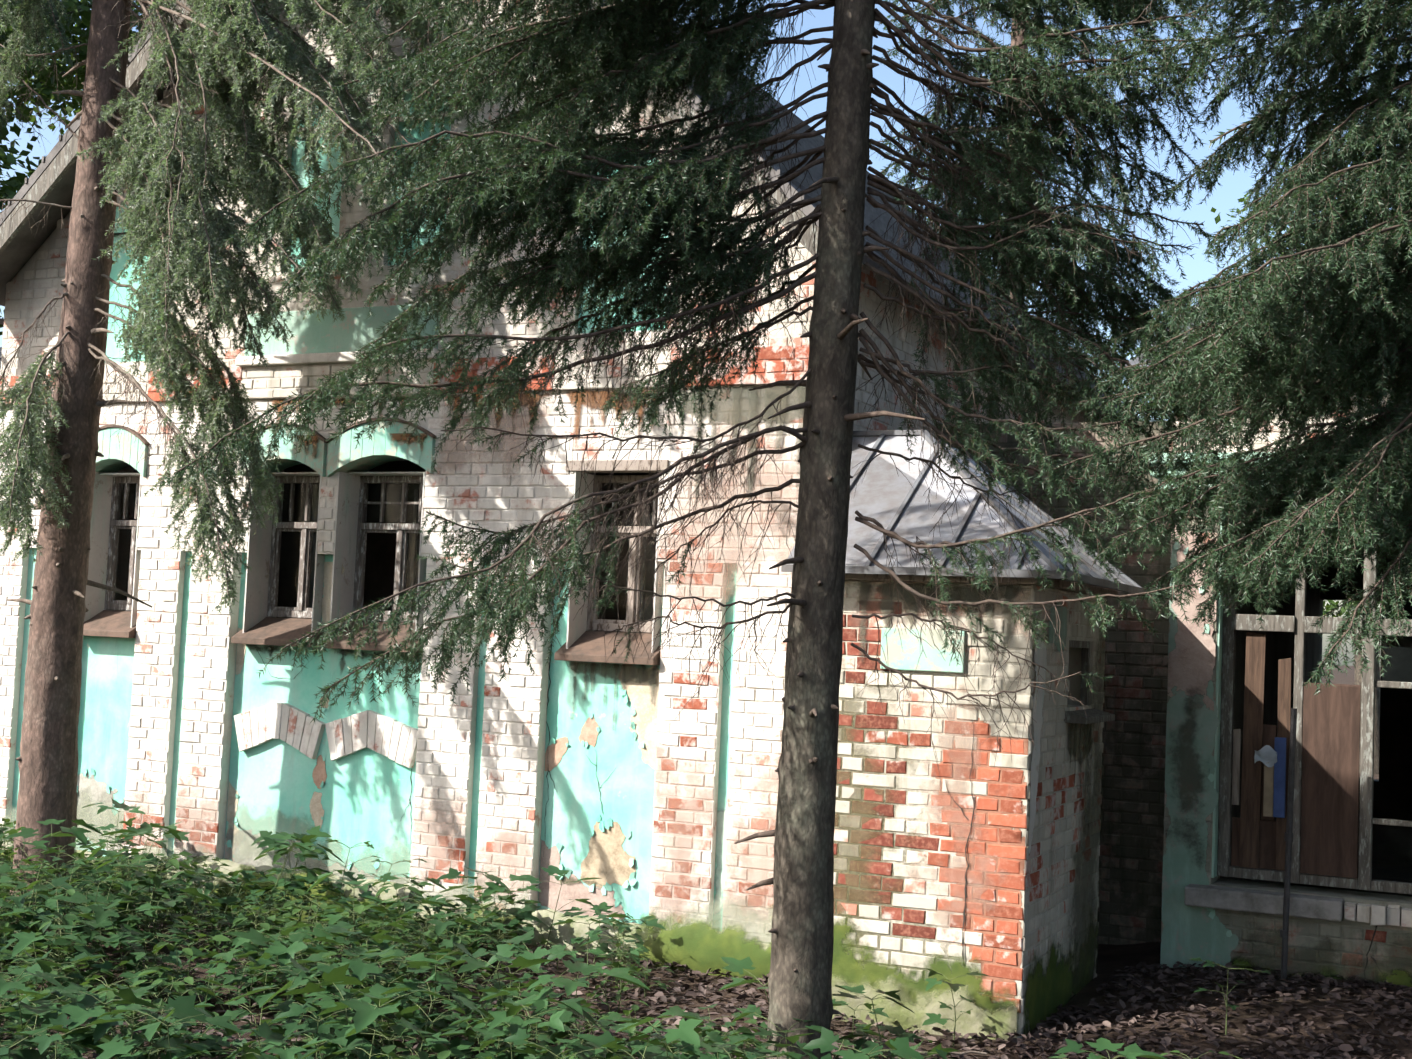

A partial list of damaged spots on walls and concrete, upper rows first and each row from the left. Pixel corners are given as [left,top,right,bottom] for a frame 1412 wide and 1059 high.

spalling [842,601,902,684]
flaking render [76,768,410,898]
flaking render [309,755,327,831]
spalling [428,835,483,898]
spalling [486,842,517,855]
flaking render [545,713,600,771]
flaking render [538,814,637,923]
flaking render [619,661,720,771]
spalling [653,798,703,836]
spalling [655,861,712,925]
spalling [837,640,1084,1013]
leakage [1168,695,1204,862]